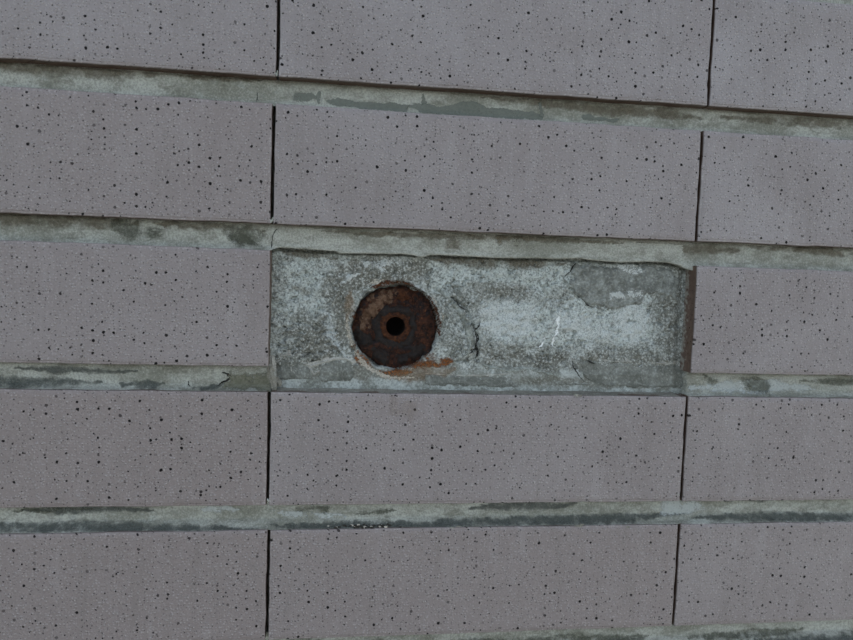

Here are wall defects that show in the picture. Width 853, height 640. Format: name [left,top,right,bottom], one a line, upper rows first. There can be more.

rust [351,312,453,377]
rust [371,280,442,336]
spalling [270,248,686,394]